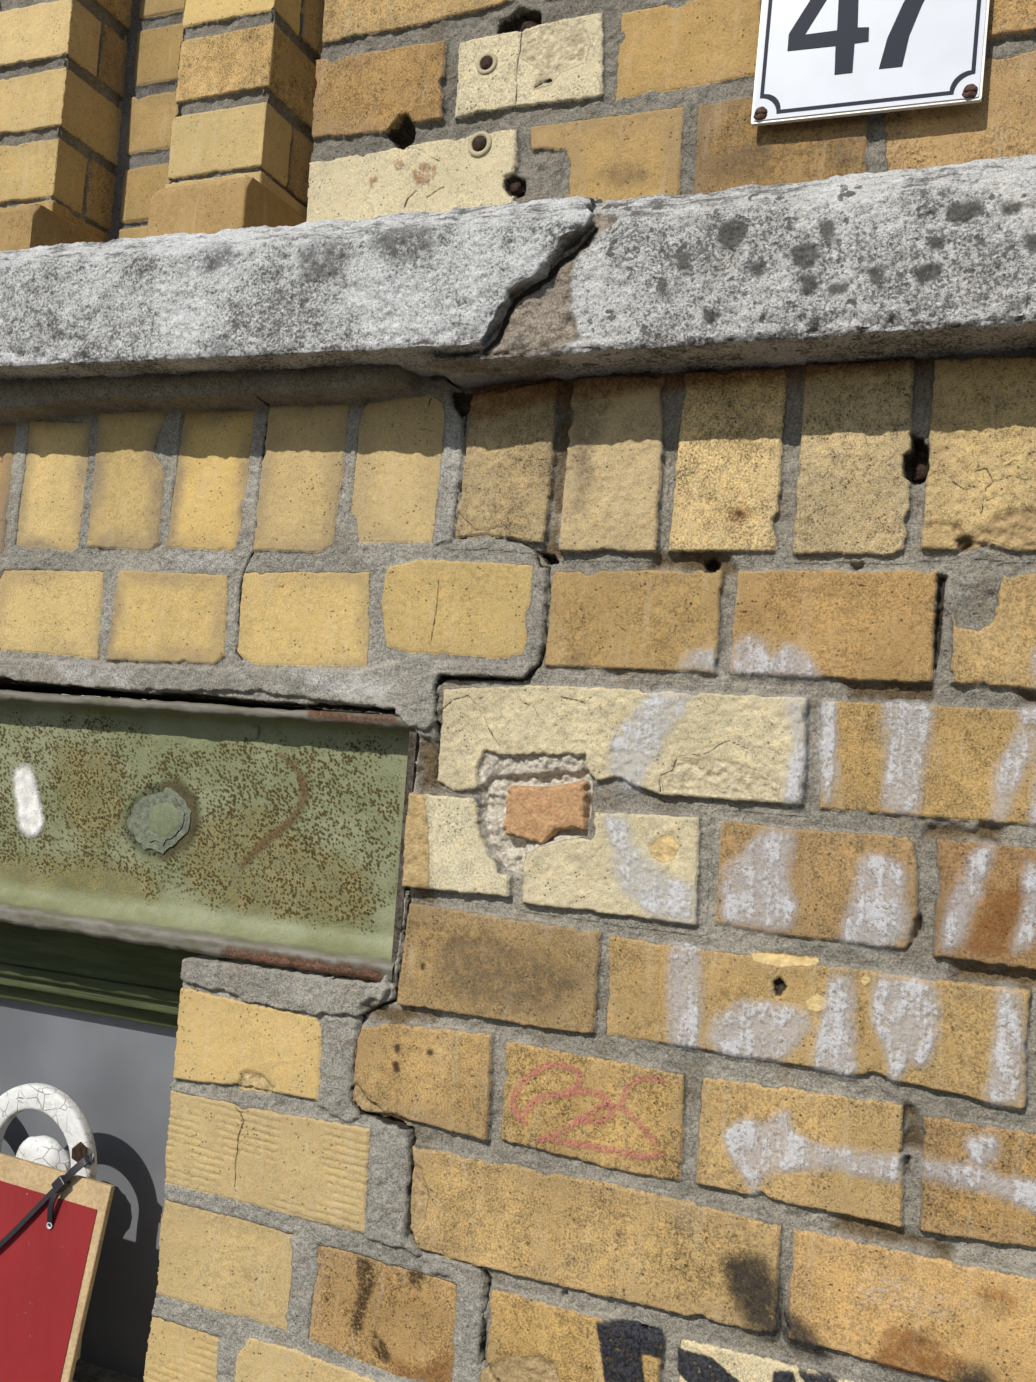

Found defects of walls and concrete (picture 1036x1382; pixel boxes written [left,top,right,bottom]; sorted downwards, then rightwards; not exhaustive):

crack [483,228,598,353]
crack [420,379,472,436]
crack [435,489,619,777]
crack [0,678,396,714]
corrosion [0,710,403,934]
spalling [478,752,593,874]
spalling [650,834,679,863]
crack [659,740,753,791]
spalling [660,757,780,802]
corrosion [221,948,381,982]
crack [351,887,417,1235]
crack [439,1254,492,1366]